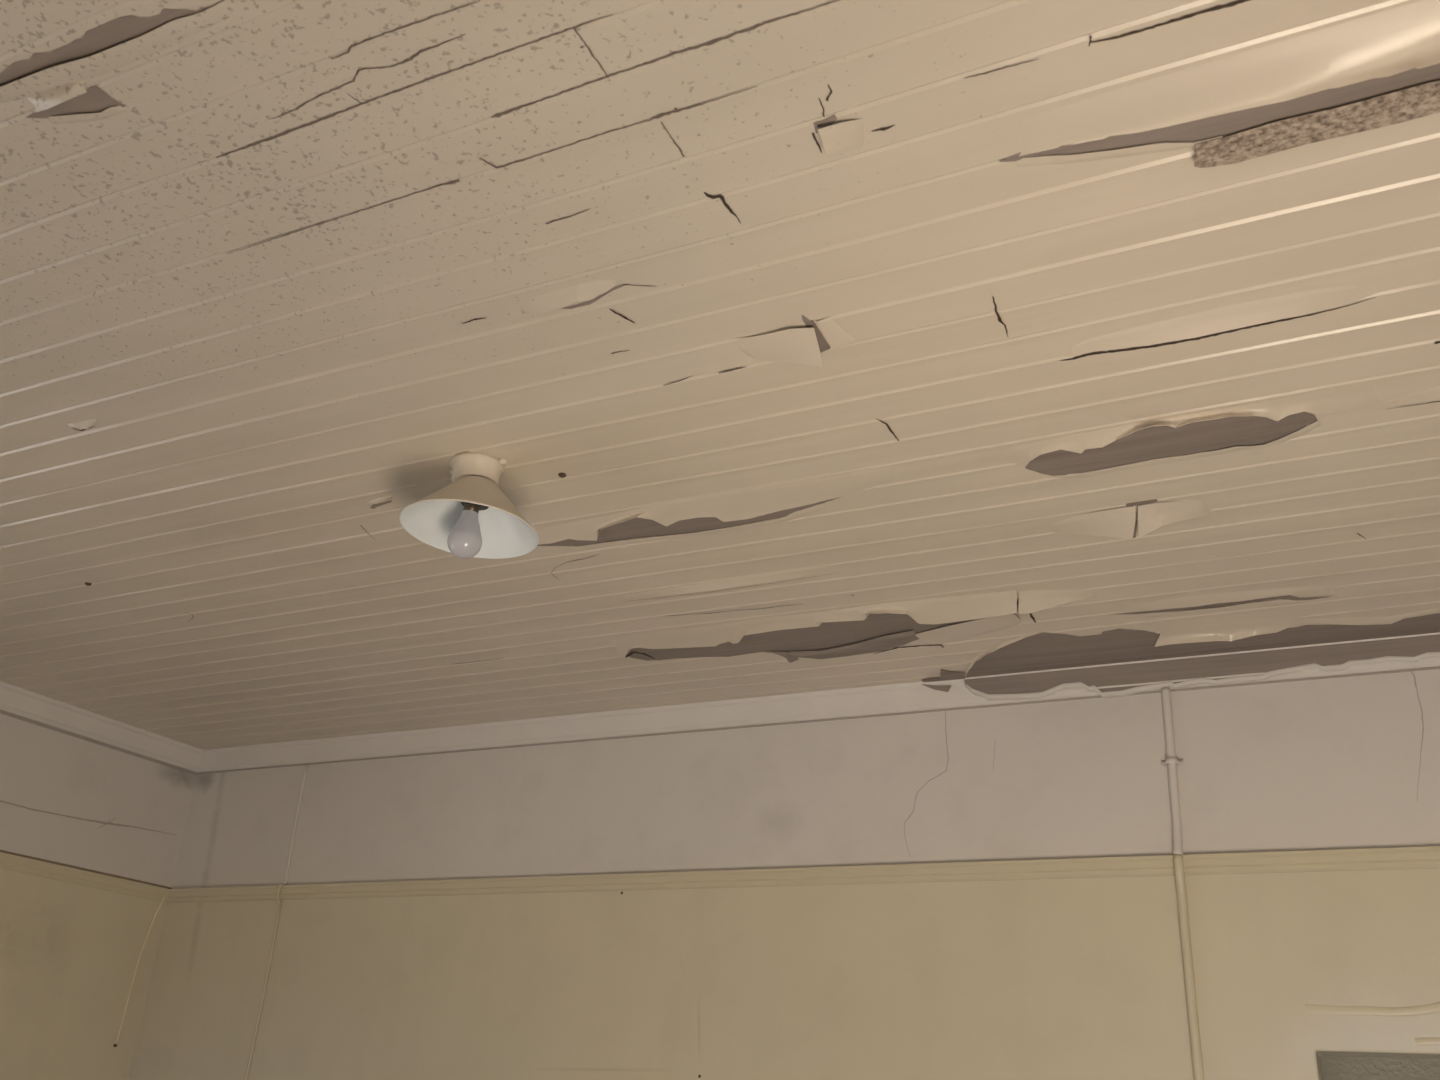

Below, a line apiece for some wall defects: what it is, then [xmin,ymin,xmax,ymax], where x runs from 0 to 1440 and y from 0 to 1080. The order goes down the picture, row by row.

peeling [0,0,235,125]
crack [228,86,758,254]
crack [216,0,839,158]
peeling [812,84,895,155]
peeling [1000,0,1440,168]
peeling [733,315,856,367]
peeling [1003,372,1398,478]
peeling [537,458,914,552]
peeling [612,585,1440,700]